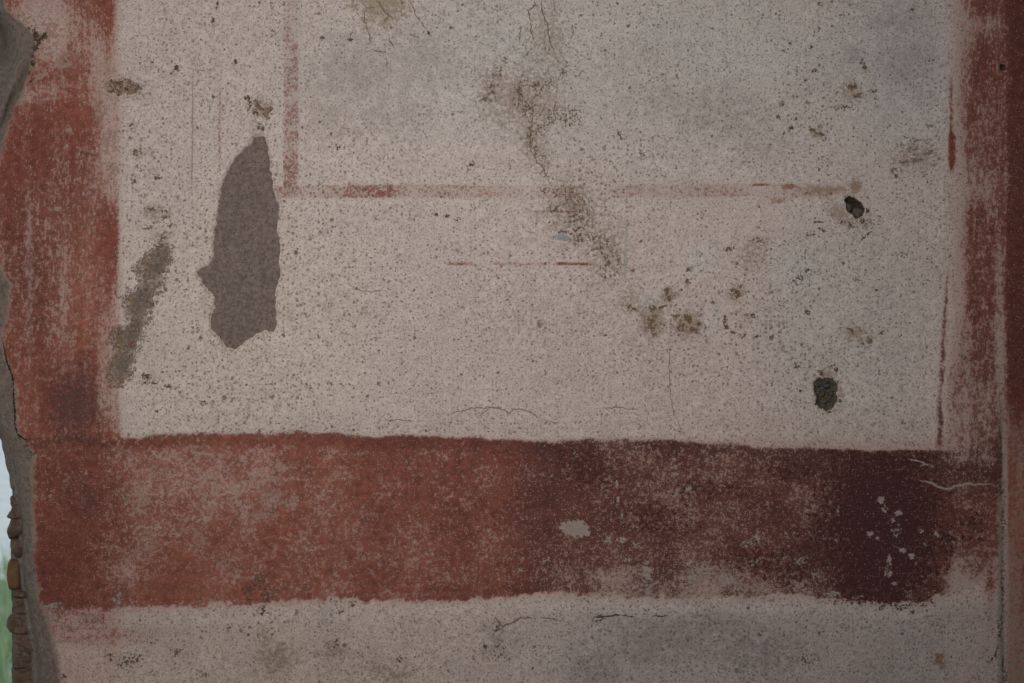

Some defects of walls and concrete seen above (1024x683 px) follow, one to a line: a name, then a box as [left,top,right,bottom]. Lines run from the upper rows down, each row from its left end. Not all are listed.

crack [519,0,574,57]
crack [518,95,556,183]
flaking render [196,95,284,352]
crack [451,406,559,423]
peeling [559,519,591,539]